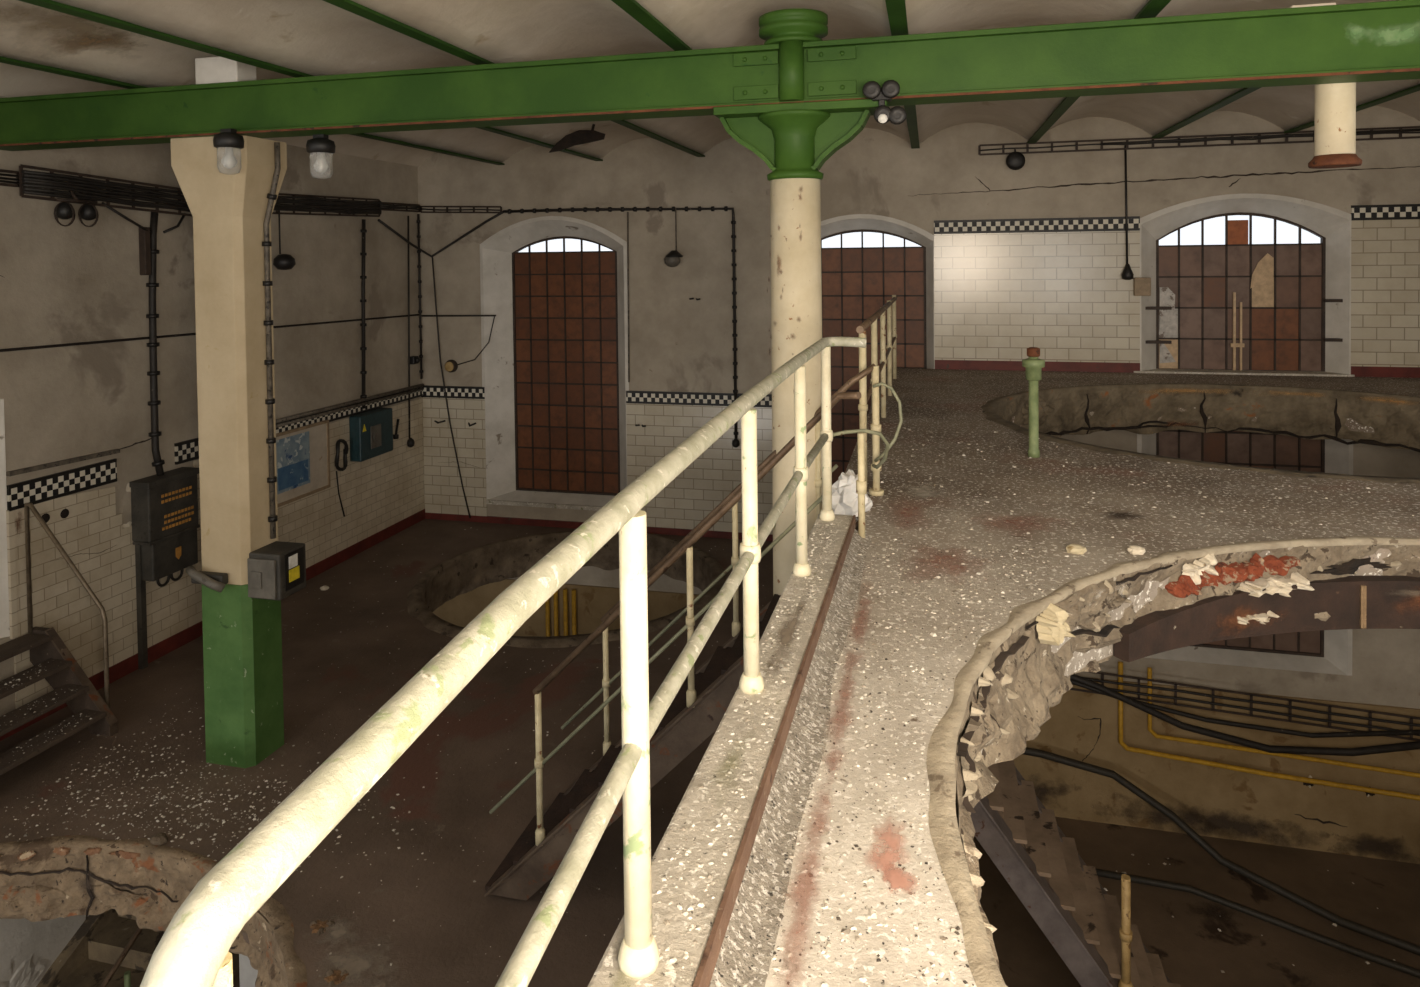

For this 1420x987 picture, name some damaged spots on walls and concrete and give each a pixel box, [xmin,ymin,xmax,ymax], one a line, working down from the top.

water stain [11,11,119,48]
peeling [1350,25,1418,43]
crack [1039,393,1420,452]
spalling [1036,553,1420,662]
spalling [960,661,1019,806]
flaking render [0,850,36,861]
crack [0,855,179,920]